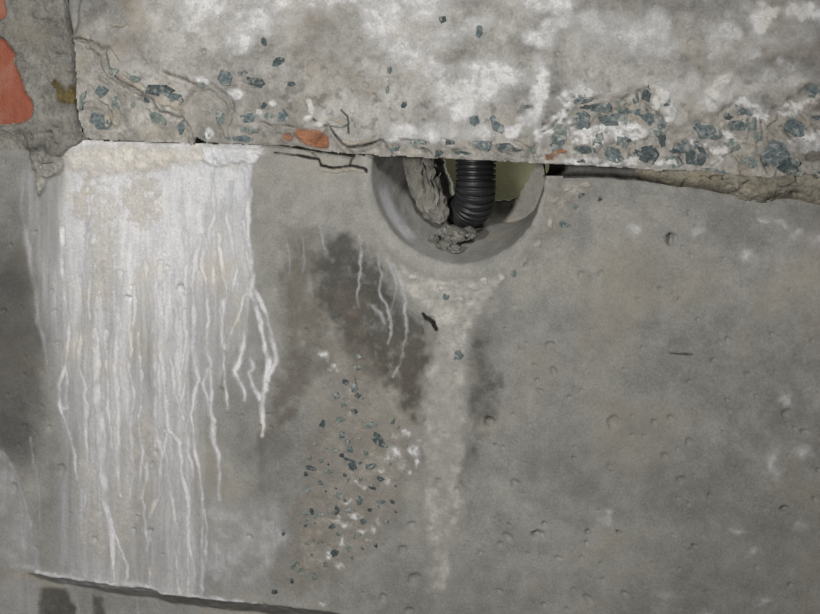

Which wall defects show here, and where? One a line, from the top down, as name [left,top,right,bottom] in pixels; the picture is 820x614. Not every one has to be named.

crack [274,110,386,173]
spalling [318,84,820,179]
leakage [0,140,288,614]
leakage [287,234,495,591]